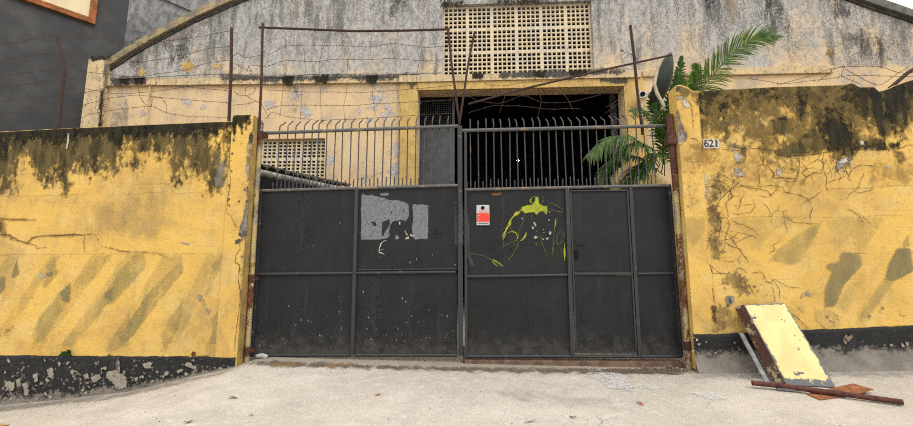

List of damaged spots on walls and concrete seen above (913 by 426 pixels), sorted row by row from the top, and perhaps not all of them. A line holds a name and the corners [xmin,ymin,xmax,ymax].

water stain [761,0,791,33]
water stain [157,28,194,66]
water stain [842,28,884,63]
water stain [219,72,419,93]
water stain [499,67,629,84]
water stain [0,55,251,198]
water stain [676,80,913,181]
crack [0,196,213,260]
crack [677,95,907,330]
peeling [2,359,197,401]